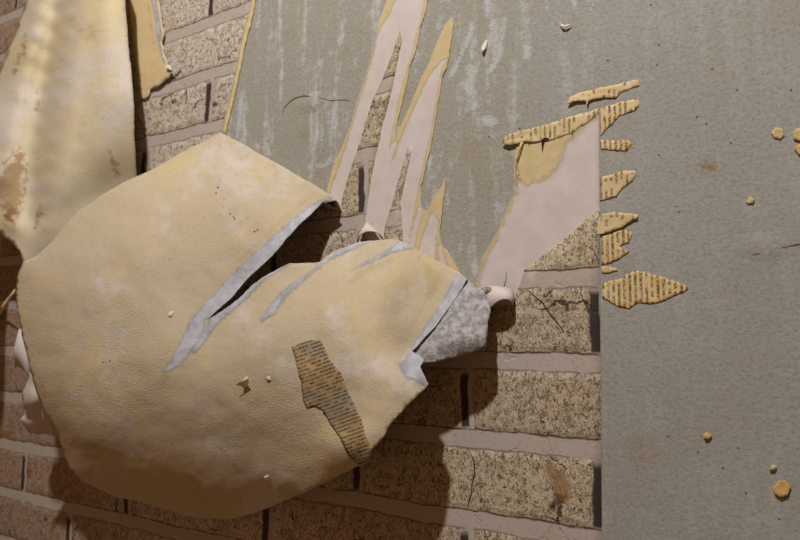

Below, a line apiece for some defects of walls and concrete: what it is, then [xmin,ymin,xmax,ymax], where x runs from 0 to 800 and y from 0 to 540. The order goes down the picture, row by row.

crack [528,290,563,330]